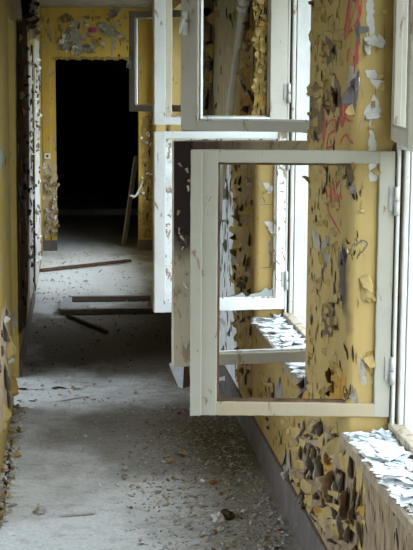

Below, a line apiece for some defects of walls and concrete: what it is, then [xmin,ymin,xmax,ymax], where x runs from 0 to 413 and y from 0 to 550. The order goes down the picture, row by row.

flaking render [56,8,129,56]
flaking render [203,0,268,116]
peeling [306,0,386,151]
peeling [16,0,60,335]
peeling [140,115,153,240]
peeling [369,164,381,182]
peeling [219,162,358,401]
peeling [359,274,377,301]
peeling [0,301,19,435]
peeling [362,350,378,379]
spalling [273,416,413,550]